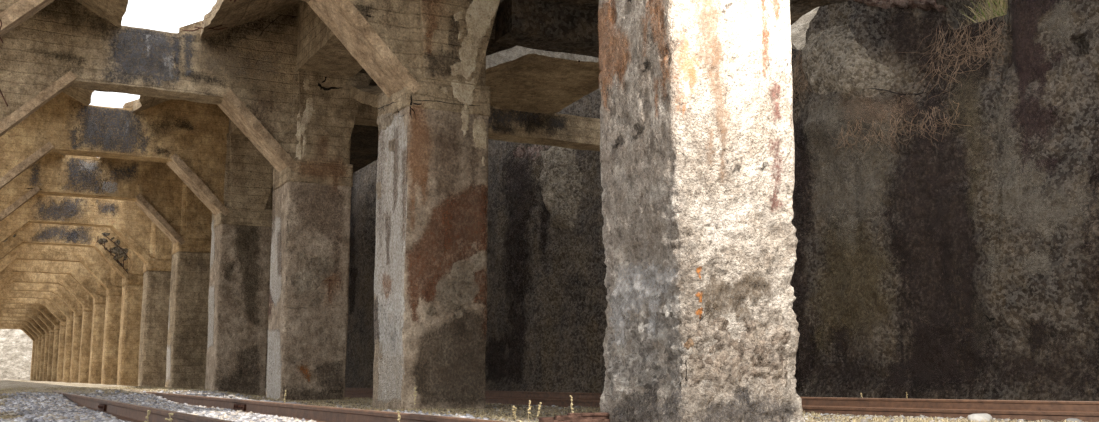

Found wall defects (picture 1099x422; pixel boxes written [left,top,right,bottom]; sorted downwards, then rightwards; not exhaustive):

damp [40,0,295,95]
crack [318,77,343,90]
peeling [440,0,500,166]
corrosion [598,0,629,106]
damp [32,105,194,243]
damp [294,173,358,314]
damp [378,118,408,265]
corrosion [407,104,488,322]
damp [373,149,548,408]
damp [790,0,1099,400]